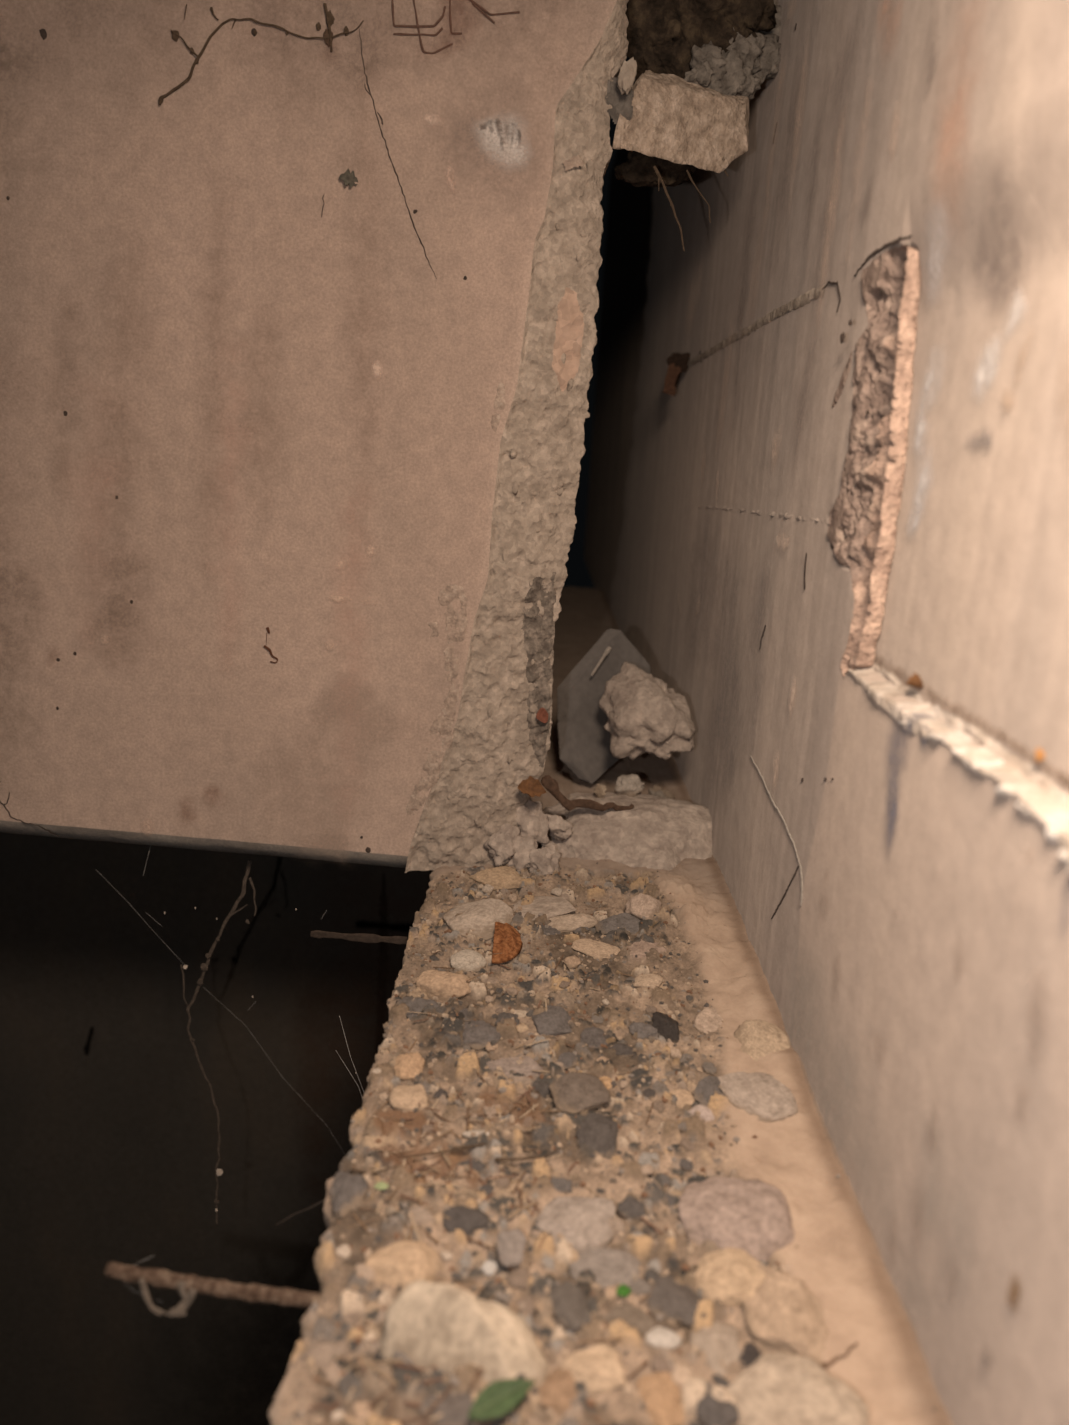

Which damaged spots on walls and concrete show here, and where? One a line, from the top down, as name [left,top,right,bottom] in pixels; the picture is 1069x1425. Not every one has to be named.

crack [359,29,437,279]
spalling [405,0,634,873]
spalling [827,245,1069,873]
spalling [450,949,487,973]
spalling [633,973,663,989]
spalling [513,1010,528,1033]
spalling [670,1089,715,1122]
spalling [462,1130,490,1139]
peeling [478,1228,526,1277]
peeling [645,1327,682,1351]